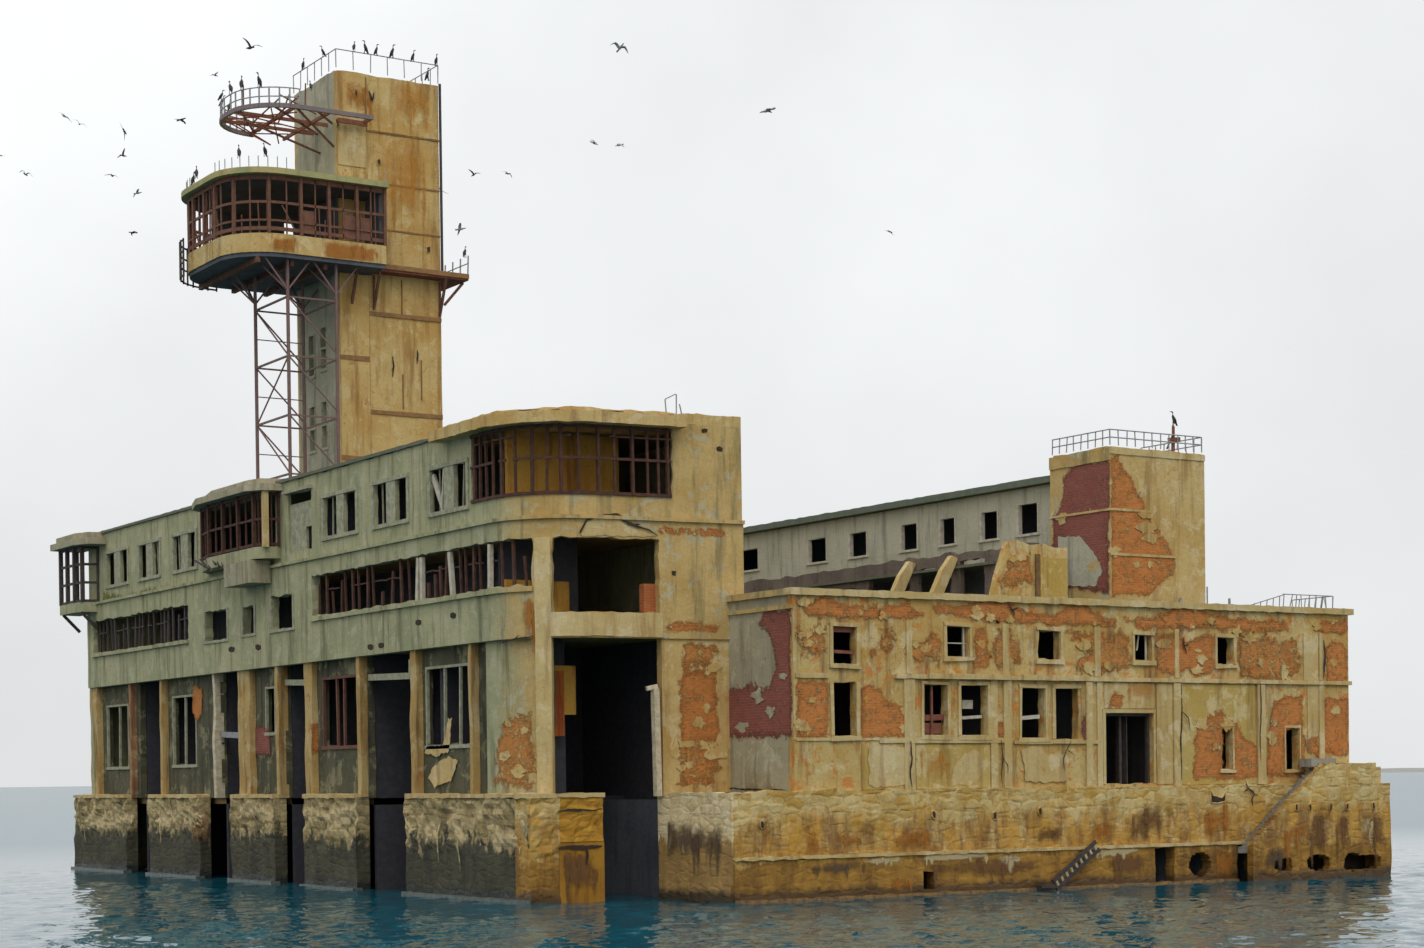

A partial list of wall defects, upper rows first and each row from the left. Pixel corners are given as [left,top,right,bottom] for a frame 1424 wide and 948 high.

peeling [667,456,1349,804]
peeling [493,710,537,792]
leakage [84,814,133,836]
leakage [158,808,205,842]
leakage [239,803,274,822]
leakage [313,805,359,828]
leakage [425,817,468,862]
leakage [489,829,521,855]
leakage [813,852,899,877]
leakage [924,853,1033,886]
leakage [1096,848,1142,879]